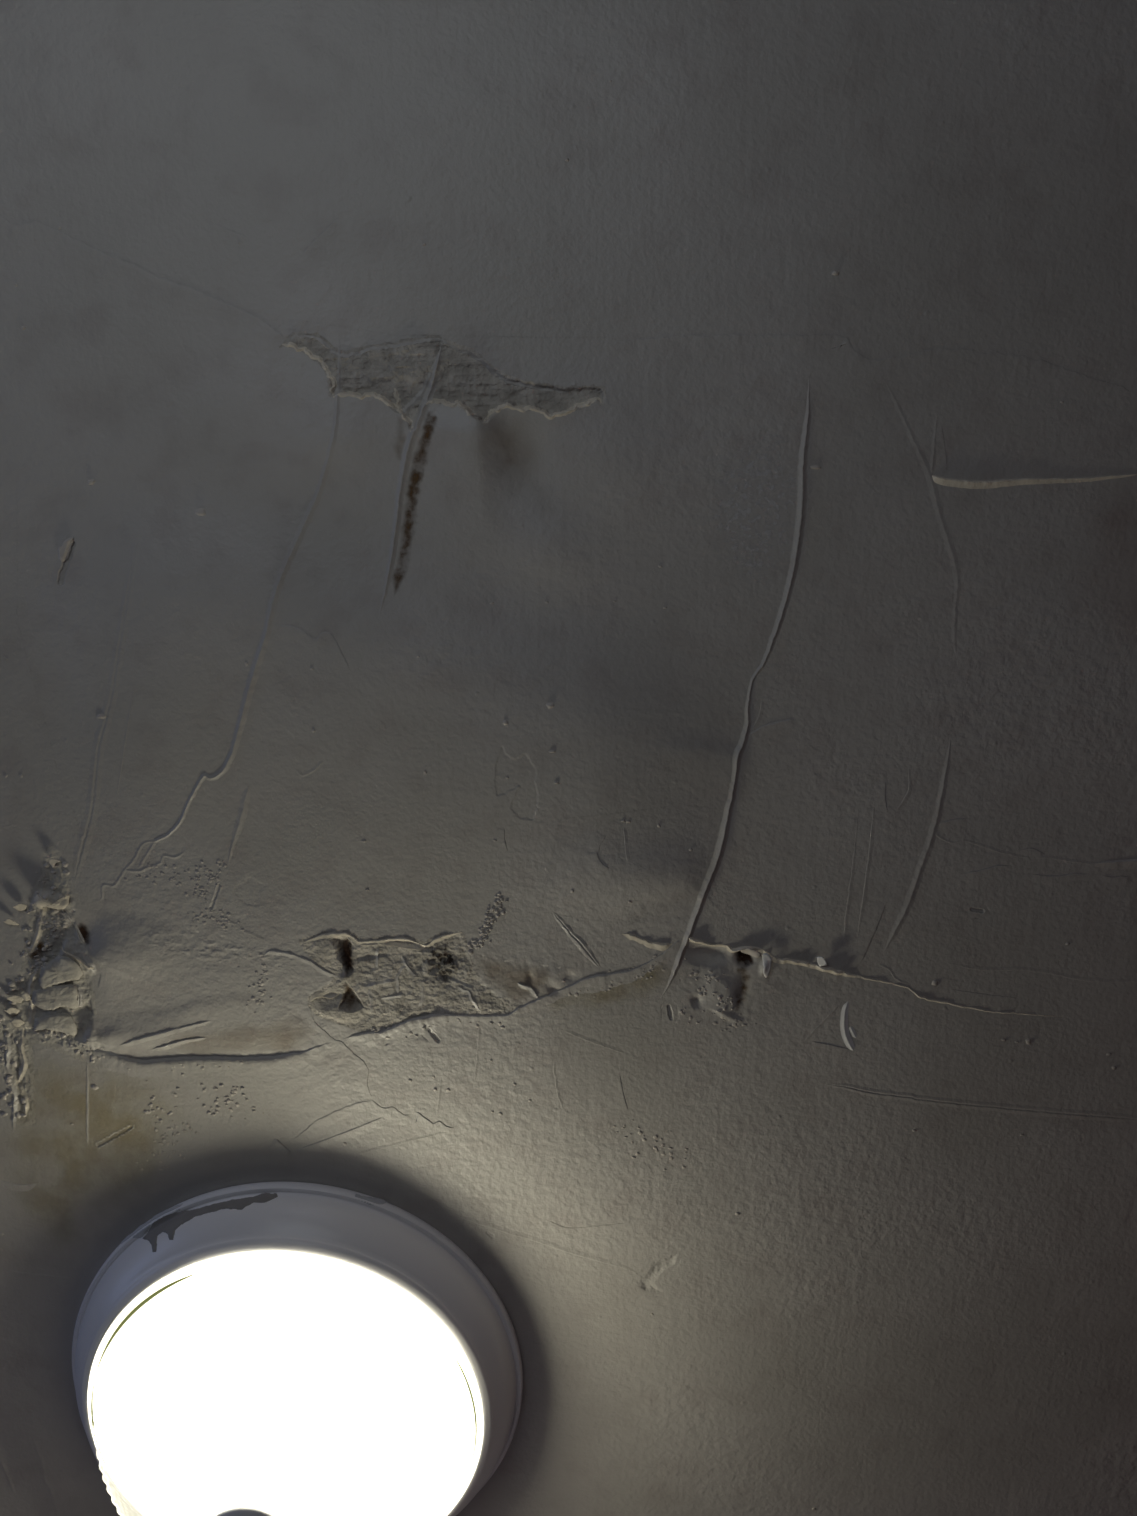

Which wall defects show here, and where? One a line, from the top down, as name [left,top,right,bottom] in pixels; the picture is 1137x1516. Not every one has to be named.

spalling [279,331,606,432]
crack [81,337,811,1145]
crack [882,733,951,955]
spalling [264,892,592,1050]
spalling [661,929,1062,1061]